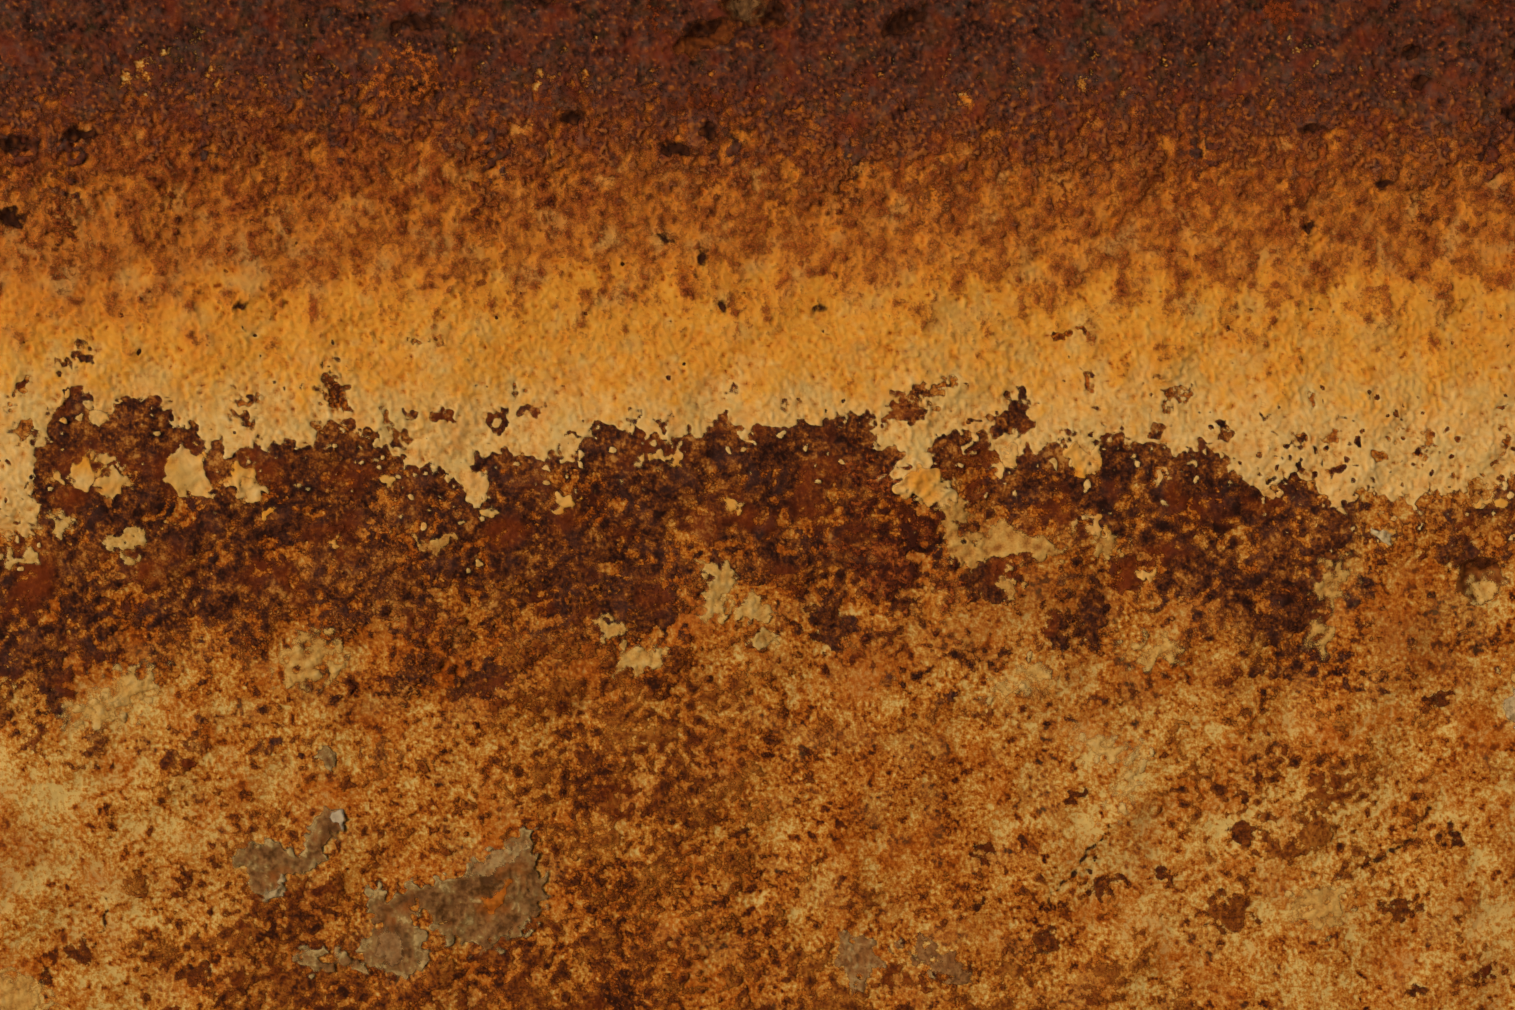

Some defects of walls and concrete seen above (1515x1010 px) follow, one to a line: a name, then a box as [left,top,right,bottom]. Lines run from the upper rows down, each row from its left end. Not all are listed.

corrosion [0,0,1515,351]
peeling [0,44,1515,608]
corrosion [0,326,1515,1010]
peeling [232,807,346,902]
peeling [292,828,549,979]